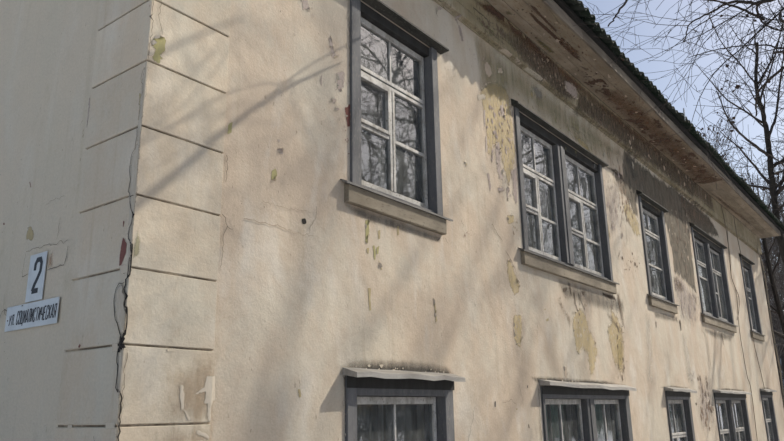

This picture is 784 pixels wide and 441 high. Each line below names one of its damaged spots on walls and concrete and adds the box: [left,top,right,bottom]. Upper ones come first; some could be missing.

peeling [149,34,166,63]
flaking render [473,7,719,295]
crack [220,201,310,267]
crack [114,137,138,441]
peeling [573,308,597,374]
peeling [607,310,625,380]